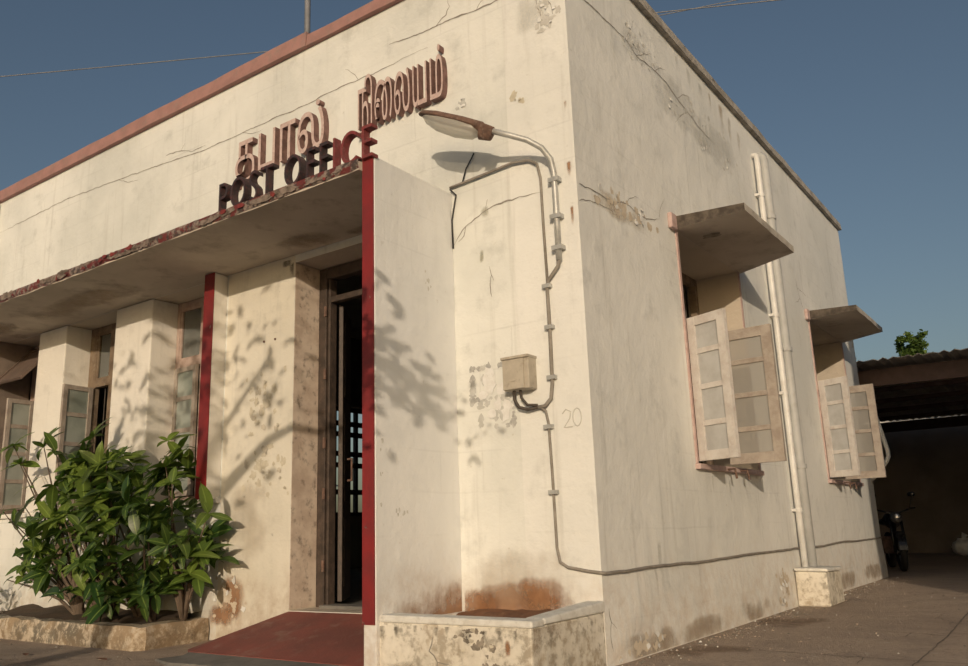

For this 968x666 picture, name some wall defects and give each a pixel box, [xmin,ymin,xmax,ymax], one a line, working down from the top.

peeling [535,0,561,34]
crack [584,0,710,139]
crack [0,0,497,233]
crack [454,192,540,245]
peeling [469,361,517,429]
peeling [241,372,289,498]
peeling [212,575,247,625]
damp [430,590,462,615]